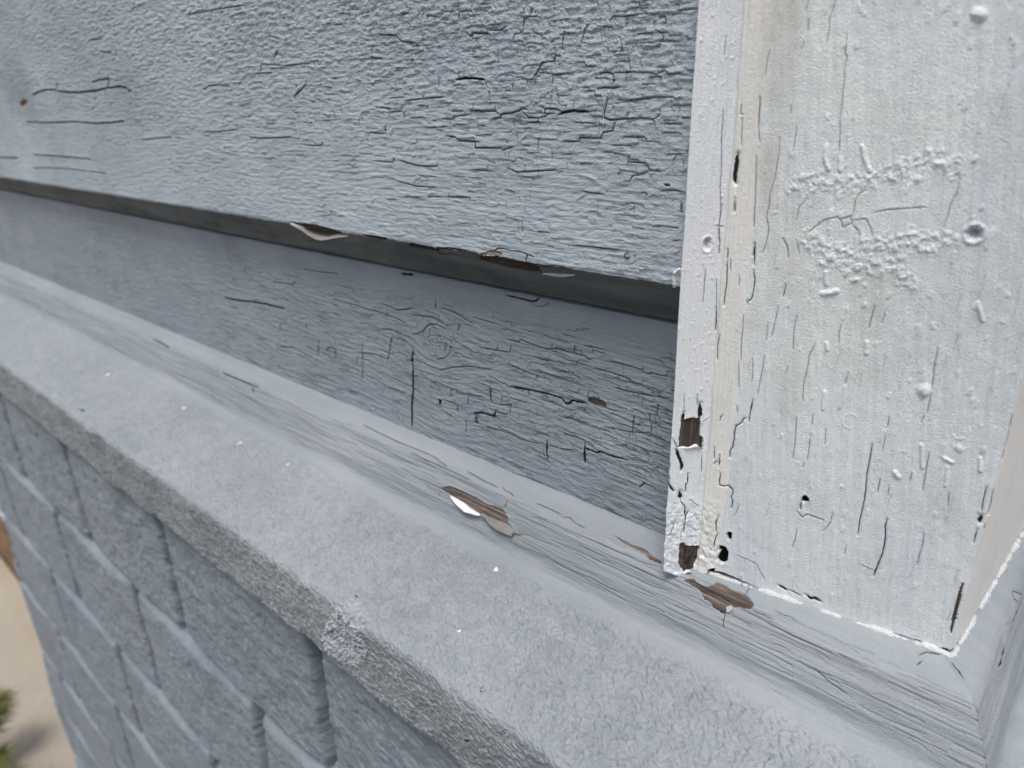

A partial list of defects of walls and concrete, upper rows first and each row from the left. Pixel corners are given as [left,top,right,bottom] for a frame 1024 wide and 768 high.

crack [33,38,131,95]
crack [372,3,682,191]
peeling [291,221,348,240]
peeling [480,250,575,277]
crack [222,107,929,550]
peeling [678,417,703,449]
peeling [439,486,523,536]
crack [974,489,992,541]
peeling [615,536,661,564]
crack [867,521,887,575]
peeling [678,543,754,614]
crack [741,558,821,618]